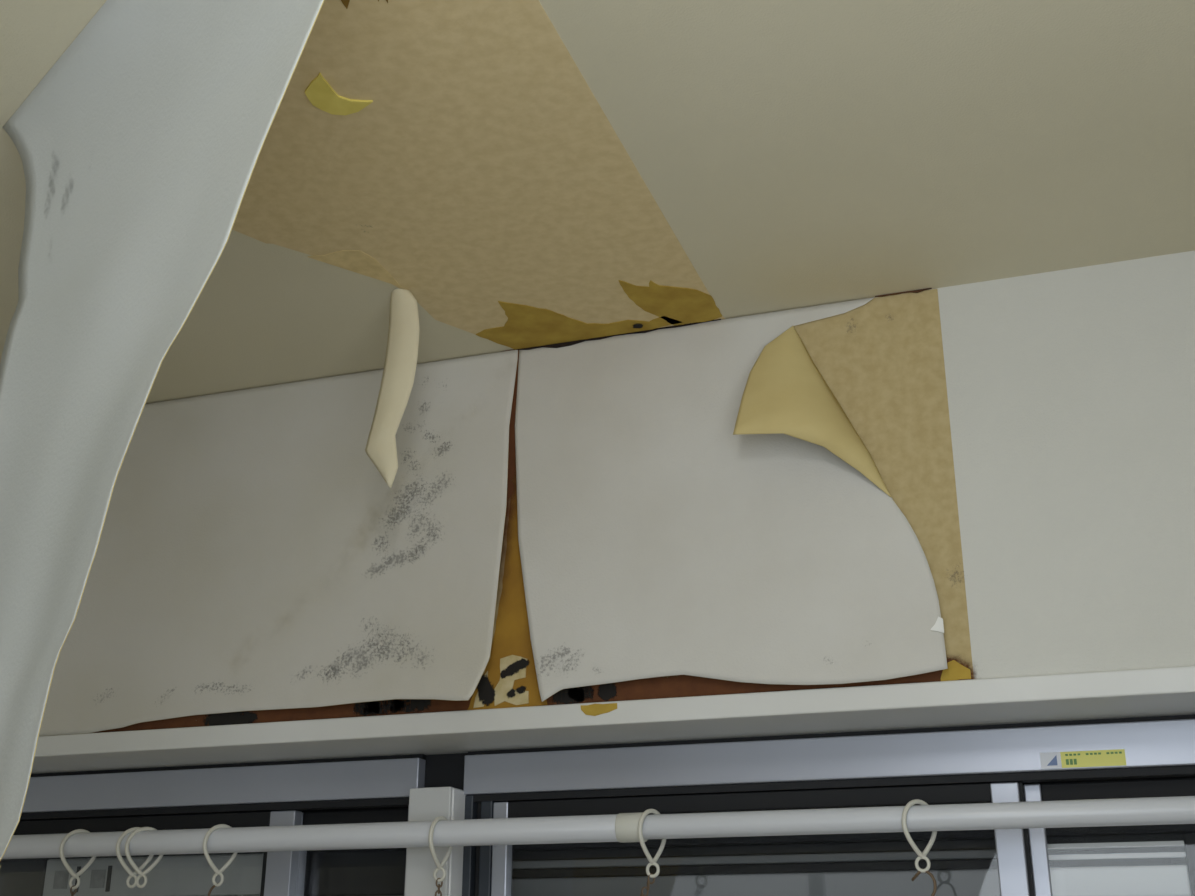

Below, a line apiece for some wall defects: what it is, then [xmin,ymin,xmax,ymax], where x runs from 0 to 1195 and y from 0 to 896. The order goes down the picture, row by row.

peeling [232,0,725,488]
peeling [468,481,547,710]
peeling [794,289,974,681]